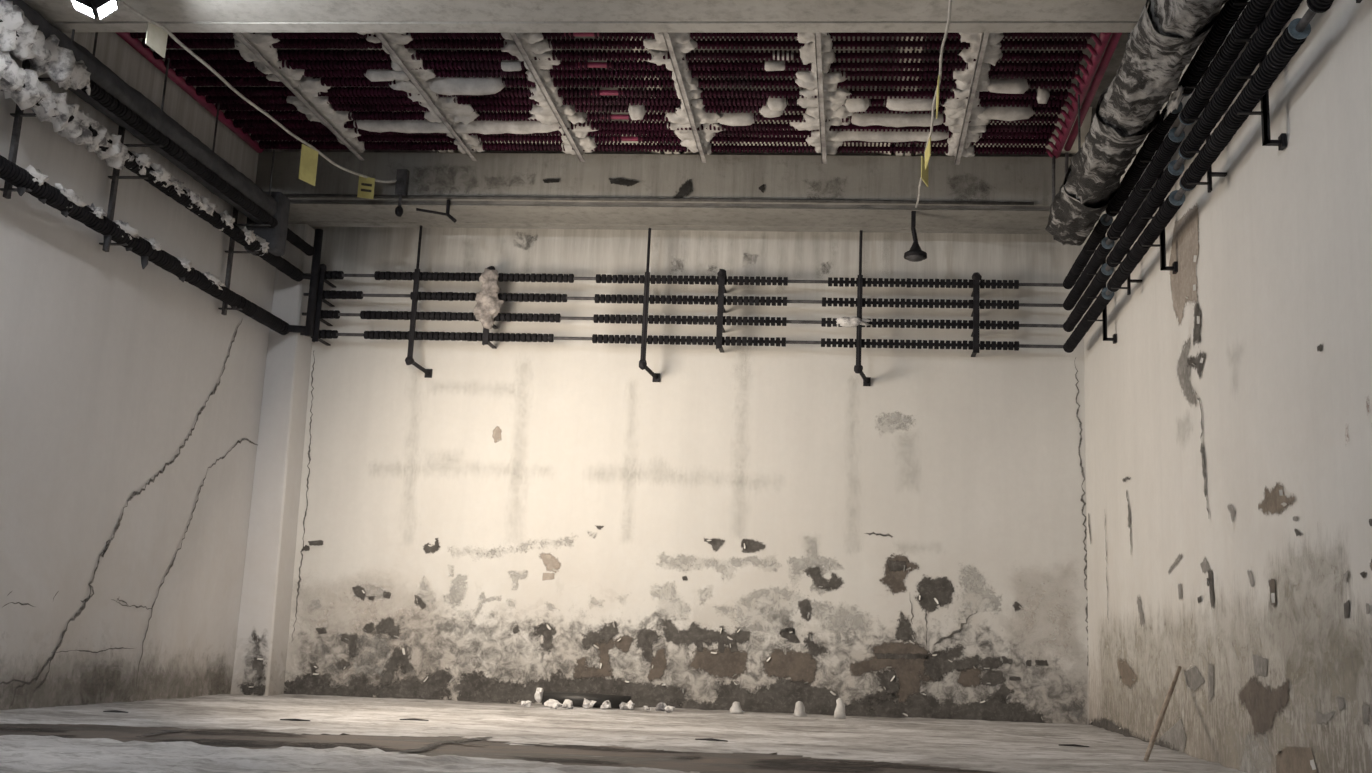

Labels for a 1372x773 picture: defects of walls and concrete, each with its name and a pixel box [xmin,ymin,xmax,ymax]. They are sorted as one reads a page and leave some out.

peeling [1169,204,1206,405]
crack [0,321,257,706]
peeling [1258,482,1301,536]
peeling [238,632,267,696]
leakage [309,615,576,696]
peeling [284,538,1048,723]
leakage [562,622,785,706]
leakage [816,630,896,706]
leakage [914,632,1084,723]
peeling [1062,703,1186,753]
peeling [1117,658,1136,689]
spalling [1239,655,1317,773]